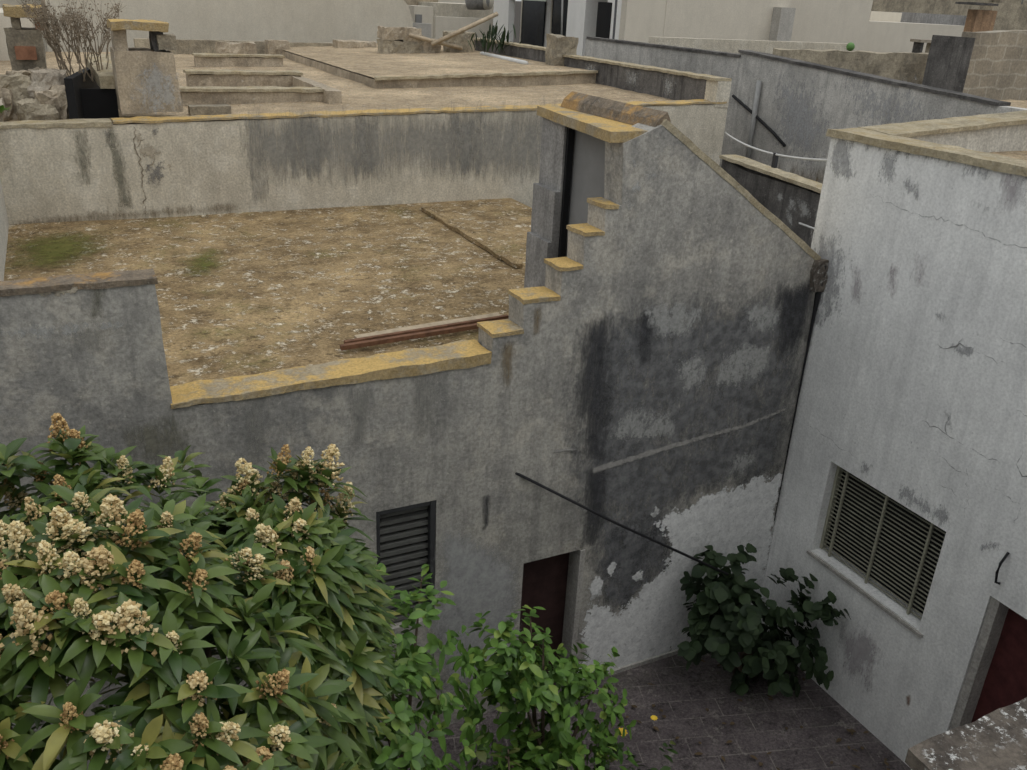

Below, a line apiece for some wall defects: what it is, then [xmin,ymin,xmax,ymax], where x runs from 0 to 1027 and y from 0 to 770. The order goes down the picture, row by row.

water stain [30,130,192,224]
crack [133,129,155,211]
water stain [257,116,543,175]
crack [939,338,1025,362]
crack [925,415,1027,521]
peeling [577,452,784,673]